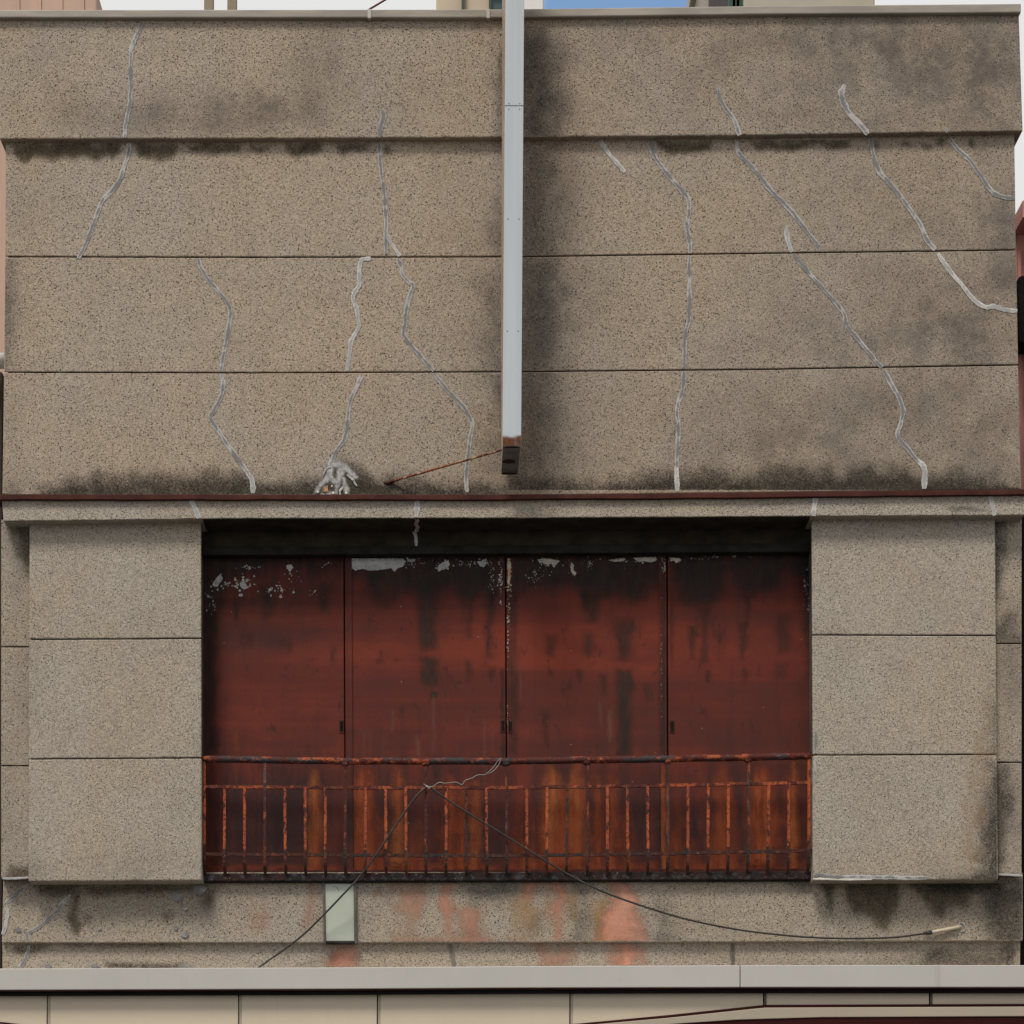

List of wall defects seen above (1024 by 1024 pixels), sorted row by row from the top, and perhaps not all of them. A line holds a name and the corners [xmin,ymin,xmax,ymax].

damp [16,143,120,162]
damp [138,144,177,159]
crack [838,84,1017,313]
crack [326,110,475,492]
crack [717,87,928,489]
damp [42,468,496,494]
peeling [206,564,299,614]
peeling [352,557,512,623]
peeling [588,555,718,577]
corrosion [522,771,616,869]
corrosion [749,769,798,869]
corrosion [596,882,647,965]